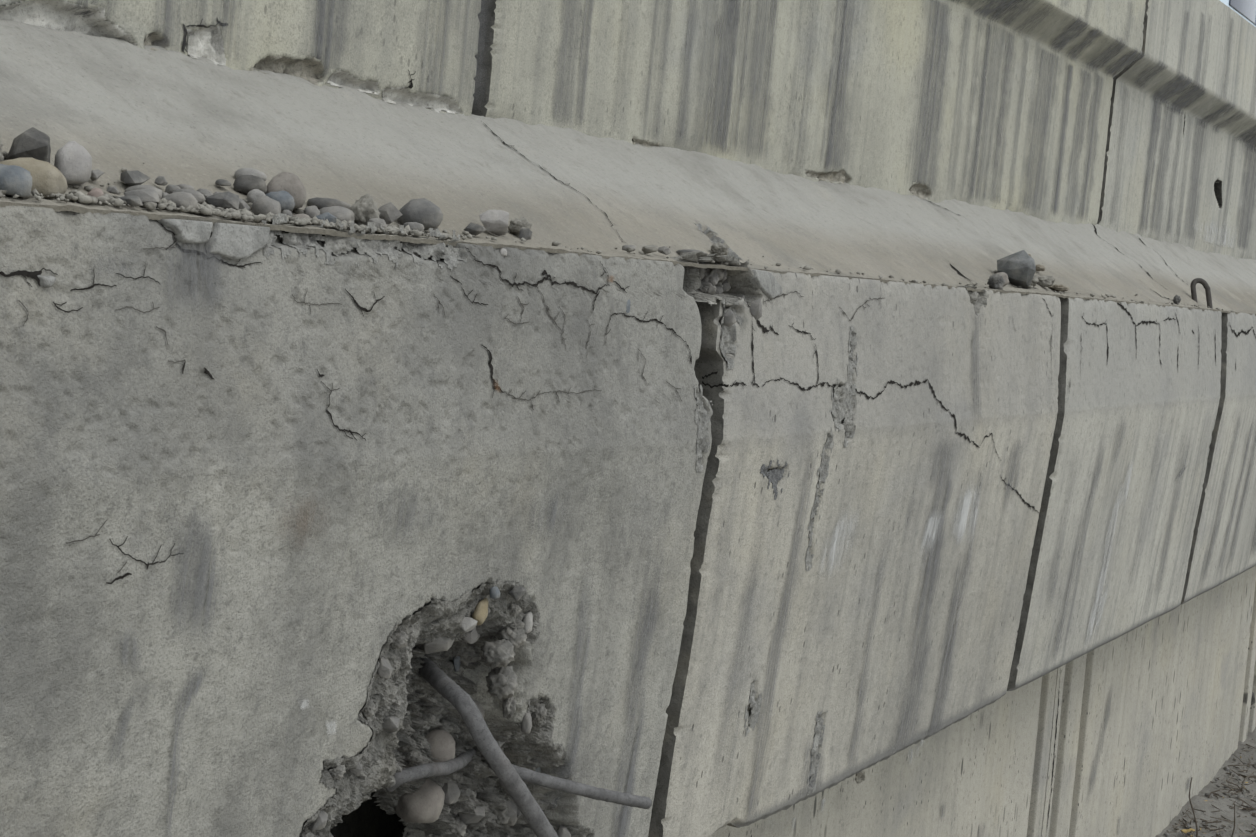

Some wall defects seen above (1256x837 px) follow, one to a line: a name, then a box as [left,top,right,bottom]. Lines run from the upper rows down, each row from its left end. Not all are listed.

leakage [1025,19,1205,230]
spalling [1214,180,1222,208]
crack [0,220,262,379]
crack [292,289,385,317]
crack [434,122,1039,513]
crack [317,369,366,441]
leakage [958,494,976,534]
crack [66,520,184,584]
spalling [299,579,595,837]